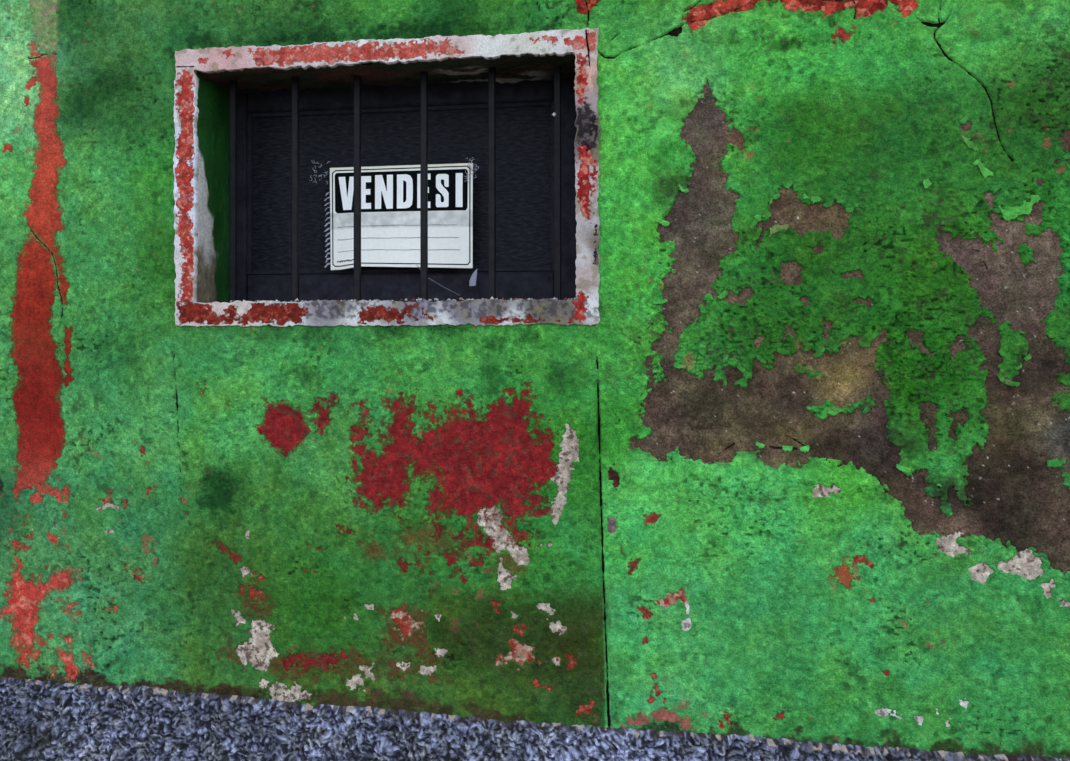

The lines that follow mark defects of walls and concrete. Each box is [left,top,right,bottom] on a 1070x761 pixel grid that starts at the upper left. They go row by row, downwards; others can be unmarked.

peeling [174,37,464,326]
peeling [529,30,599,265]
crack [584,0,752,67]
peeling [681,0,919,48]
crack [822,0,857,19]
crack [918,18,1014,161]
peeling [0,41,95,682]
peeling [479,291,590,325]
spalling [629,80,1070,607]
peeling [254,382,580,671]
peeling [396,647,448,676]
peeling [632,589,691,631]